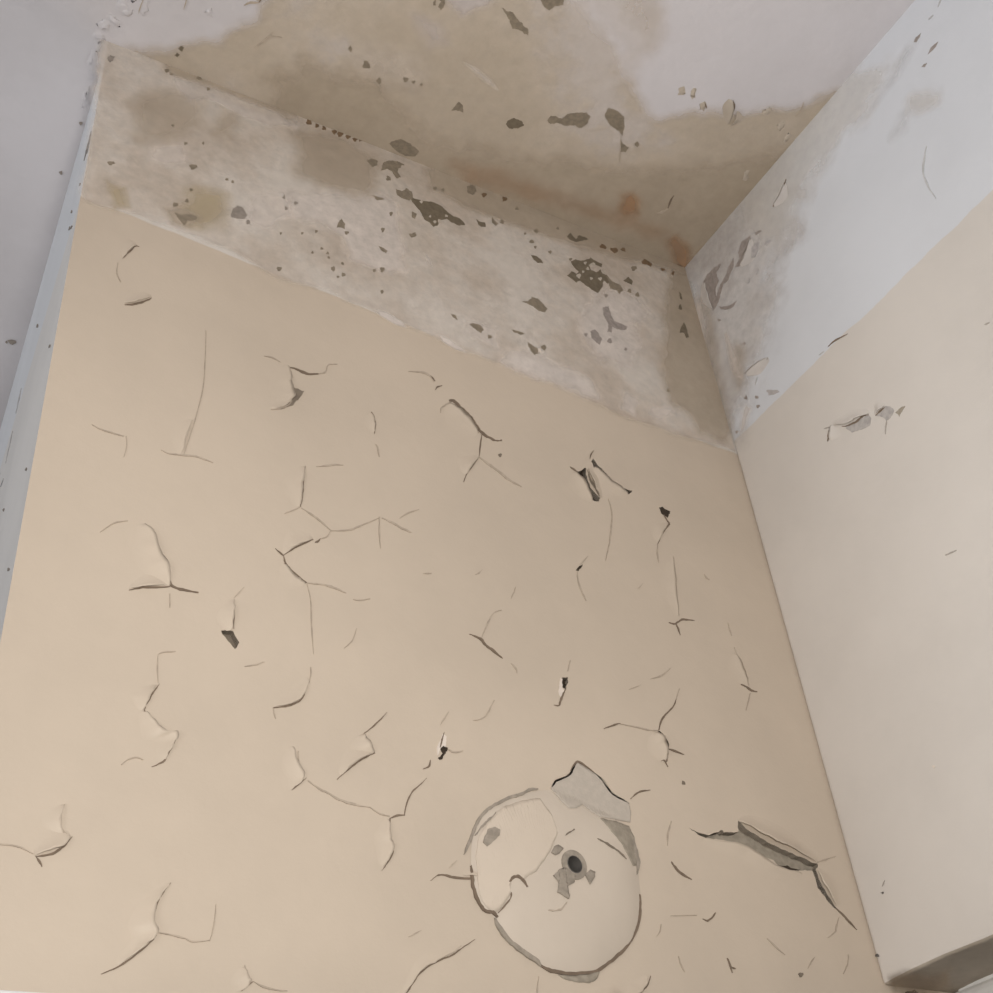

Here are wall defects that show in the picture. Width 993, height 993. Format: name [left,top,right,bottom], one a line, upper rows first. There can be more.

peeling [547,112,590,128]
peeling [605,108,639,162]
peeling [367,139,465,227]
leakage [83,0,836,450]
peeling [567,257,682,345]
crack [408,371,522,487]
peeling [824,401,905,441]
crack [270,464,419,719]
crack [469,587,517,673]
crack [638,507,695,635]
crack [498,874,528,913]
peeling [693,815,857,938]